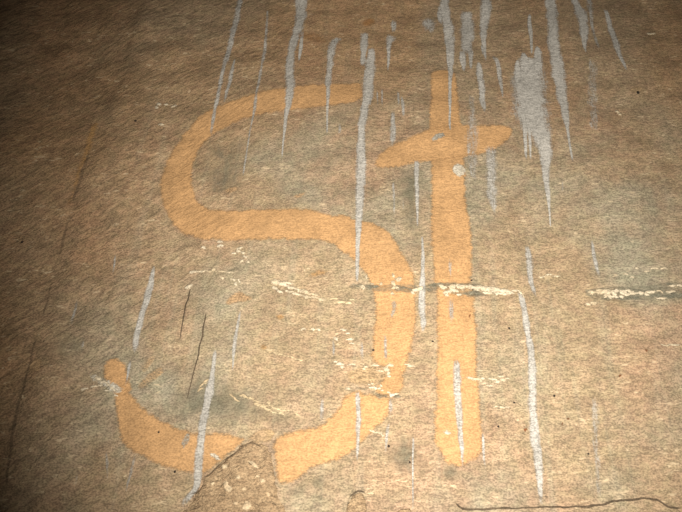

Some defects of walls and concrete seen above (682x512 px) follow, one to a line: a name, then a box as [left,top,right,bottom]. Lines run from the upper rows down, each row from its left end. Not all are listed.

leakage [210,0,243,130]
leakage [282,0,307,156]
leakage [325,38,340,132]
leakage [355,33,383,280]
leakage [407,161,419,224]
leakage [423,0,503,129]
leakage [510,0,573,226]
leakage [571,0,598,51]
leakage [133,269,155,349]
leakage [183,351,221,501]
leakage [518,293,543,497]
crack [456,497,680,511]